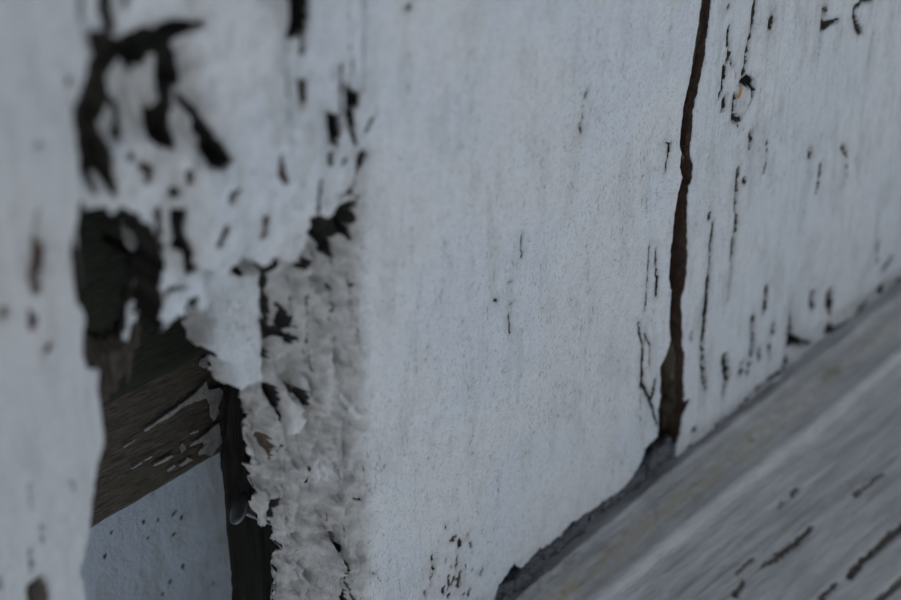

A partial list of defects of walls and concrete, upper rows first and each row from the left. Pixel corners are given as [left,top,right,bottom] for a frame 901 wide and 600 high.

crack [692,0,704,66]
crack [718,0,757,115]
peeling [72,0,265,390]
spalling [276,152,291,188]
spalling [314,174,324,215]
crack [663,139,684,175]
spalling [258,213,271,242]
spalling [290,255,311,271]
crack [636,238,678,429]
peeling [273,346,365,437]
peeling [131,422,222,472]